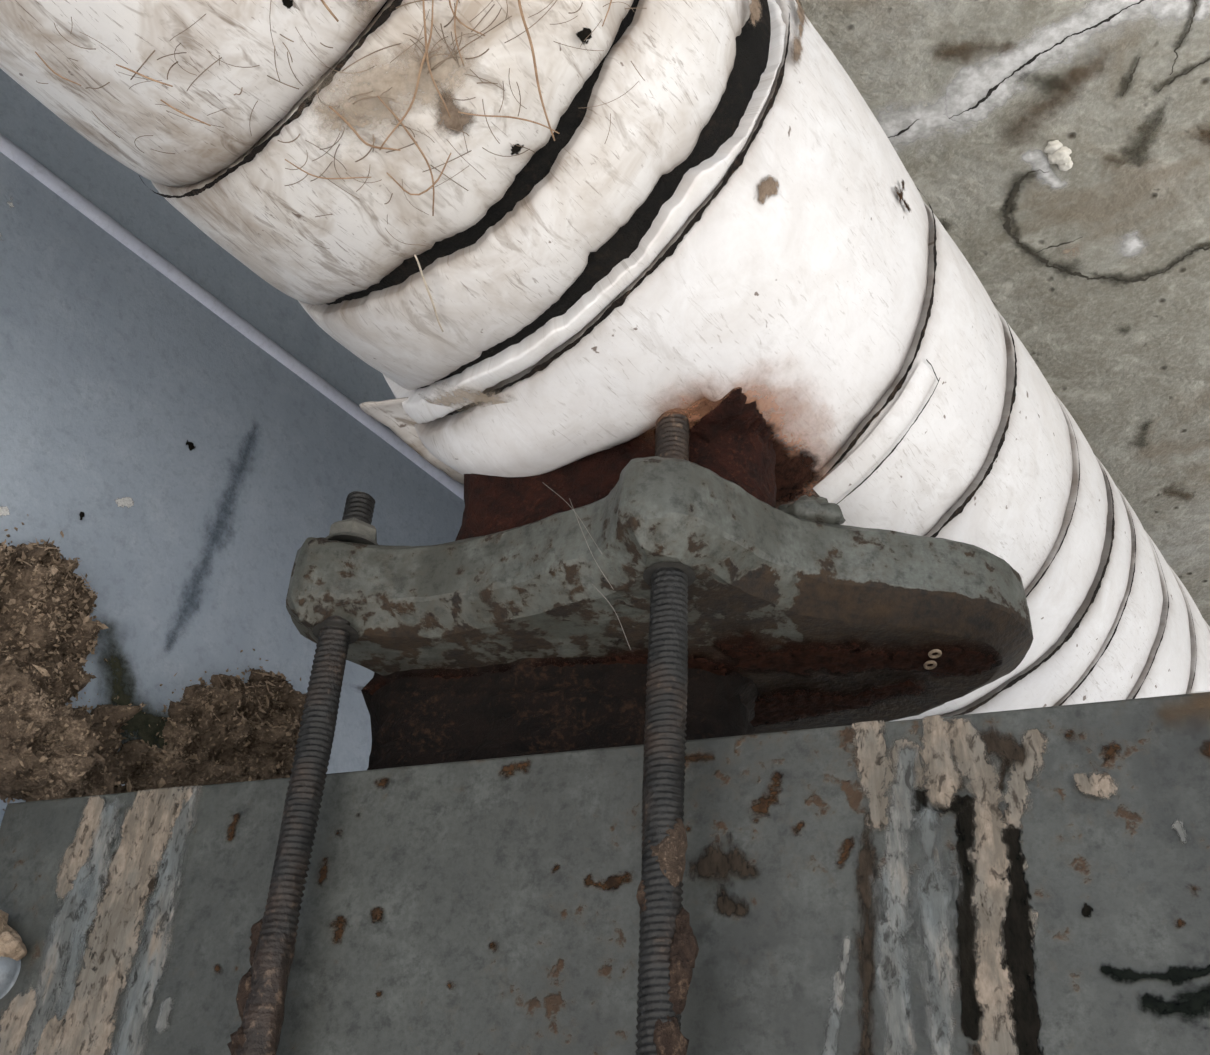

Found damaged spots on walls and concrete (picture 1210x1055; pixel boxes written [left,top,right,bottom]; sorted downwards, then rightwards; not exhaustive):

crack [878,0,1210,144]
crack [1001,169,1210,284]
rust [741,385,823,504]
rust [499,759,530,778]
rust [751,772,783,823]
rust [226,814,240,841]
rust [689,833,759,917]
damp [852,715,1048,1055]
rust [330,916,346,943]
rust [371,906,383,923]
peeling [155,997,172,1032]
damp [1100,965,1210,1021]